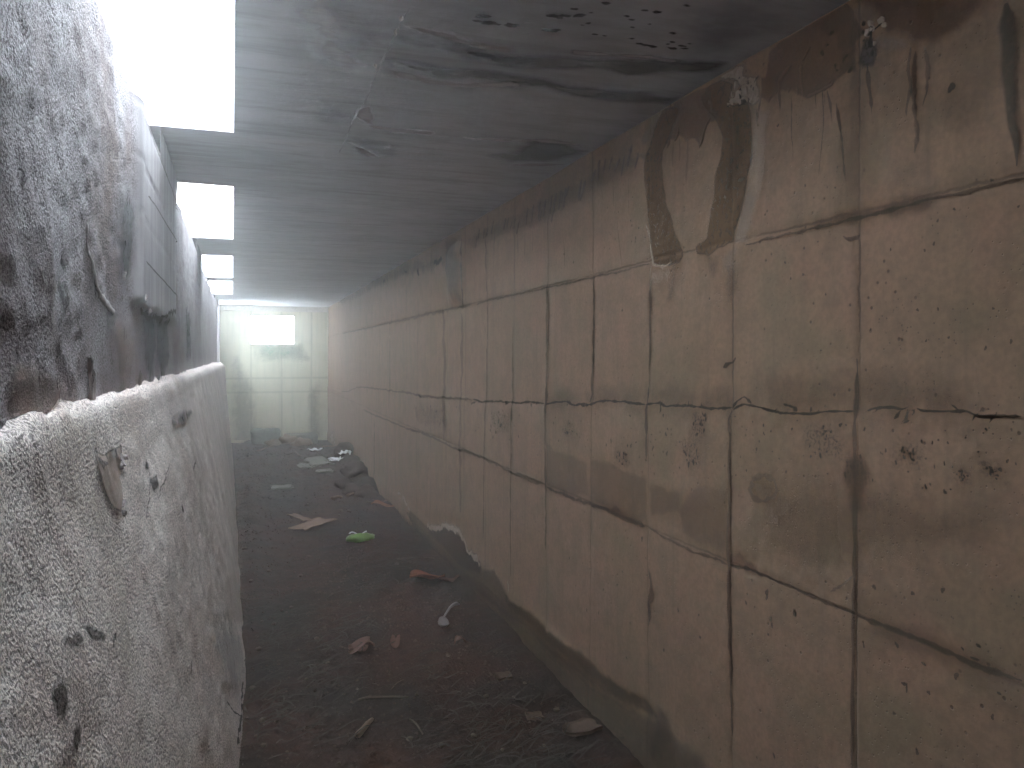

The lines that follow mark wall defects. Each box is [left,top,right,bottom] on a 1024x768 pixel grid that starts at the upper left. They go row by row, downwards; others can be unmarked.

leakage [389,4,873,271]
crack [745,178,1024,245]
leakage [865,0,977,153]
leakage [999,2,1020,166]
spalling [95,445,128,516]
crack [342,386,1022,695]